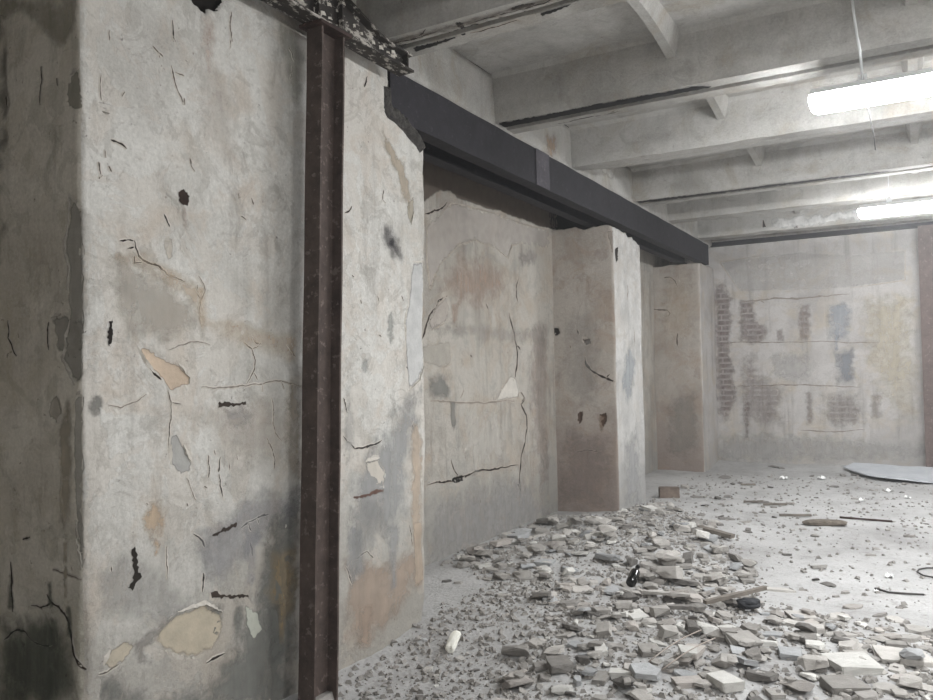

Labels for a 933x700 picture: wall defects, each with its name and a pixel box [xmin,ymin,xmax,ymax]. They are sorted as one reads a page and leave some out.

peeling [350,24,397,58]
crack [119,238,210,352]
flaking render [137,347,193,390]
crack [427,279,546,506]
crack [584,356,615,383]
flaking render [168,435,192,473]
flaking render [354,457,385,499]
water stain [1,608,71,700]
crack [4,562,119,676]
flaking render [159,591,262,660]